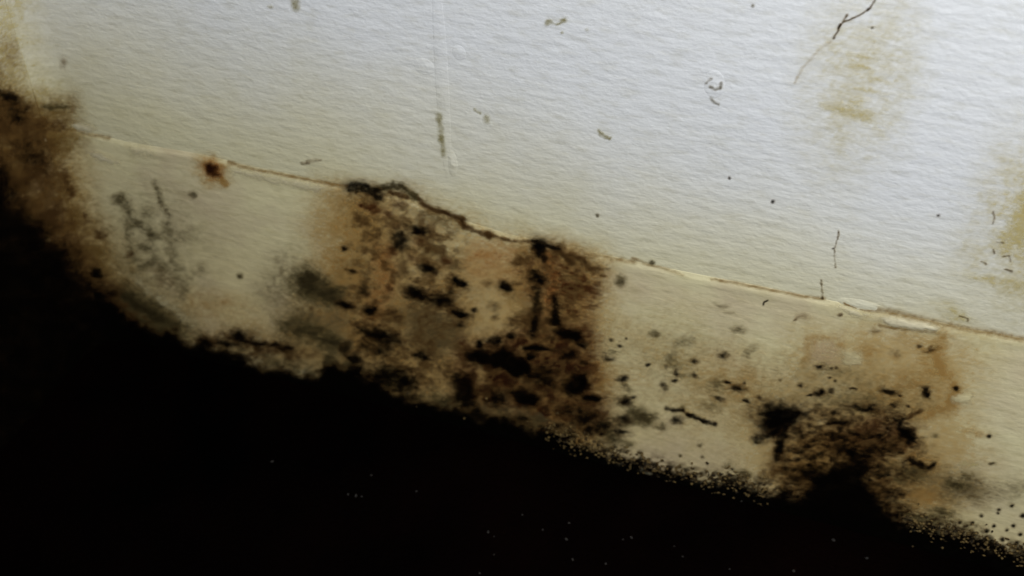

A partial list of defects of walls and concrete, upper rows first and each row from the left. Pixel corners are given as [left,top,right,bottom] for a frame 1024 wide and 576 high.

damp [0,64,140,452]
rust [202,157,229,187]
damp [93,181,1024,576]